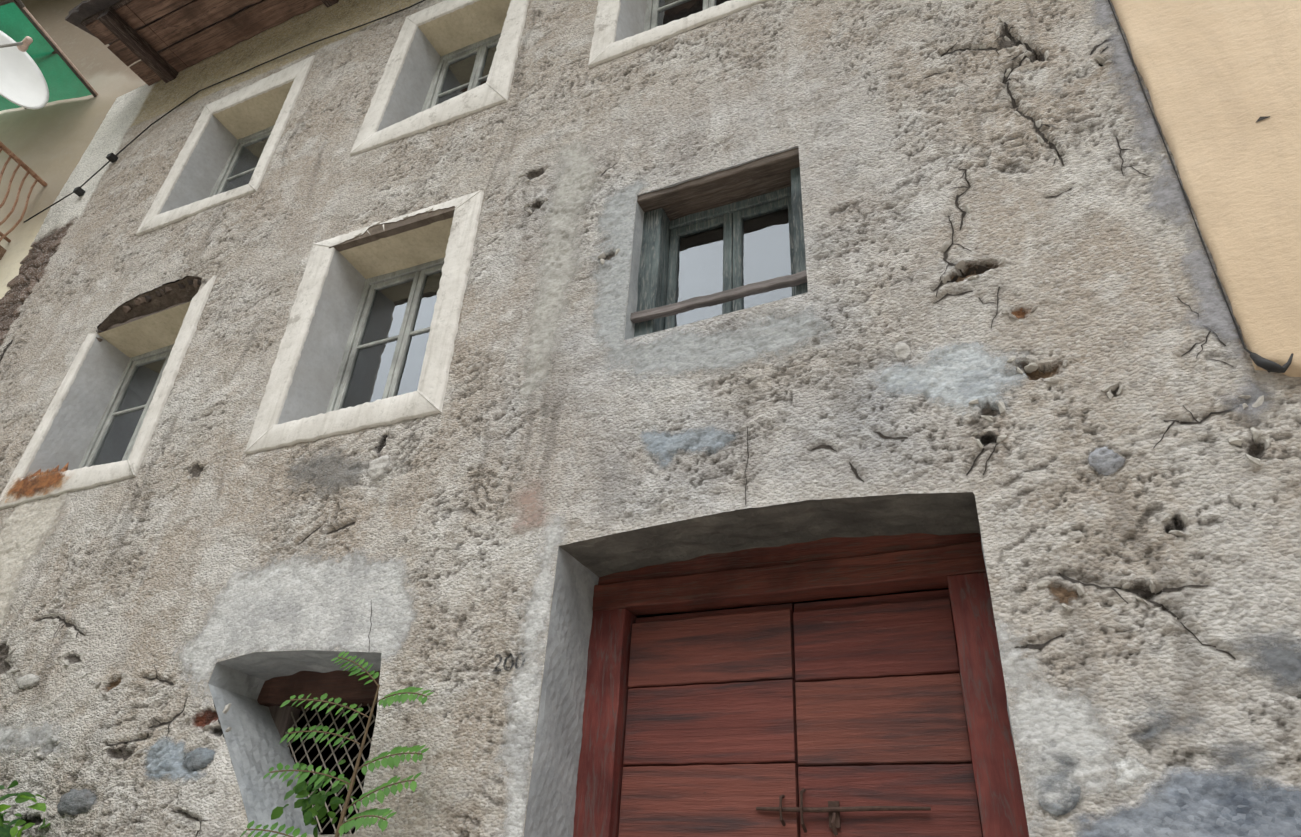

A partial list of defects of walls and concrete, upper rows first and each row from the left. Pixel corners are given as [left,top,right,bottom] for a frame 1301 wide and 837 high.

crack [923,22,1072,198]
crack [933,167,1000,328]
spalling [942,257,1006,284]
crack [1153,405,1240,449]
crack [1059,573,1236,659]